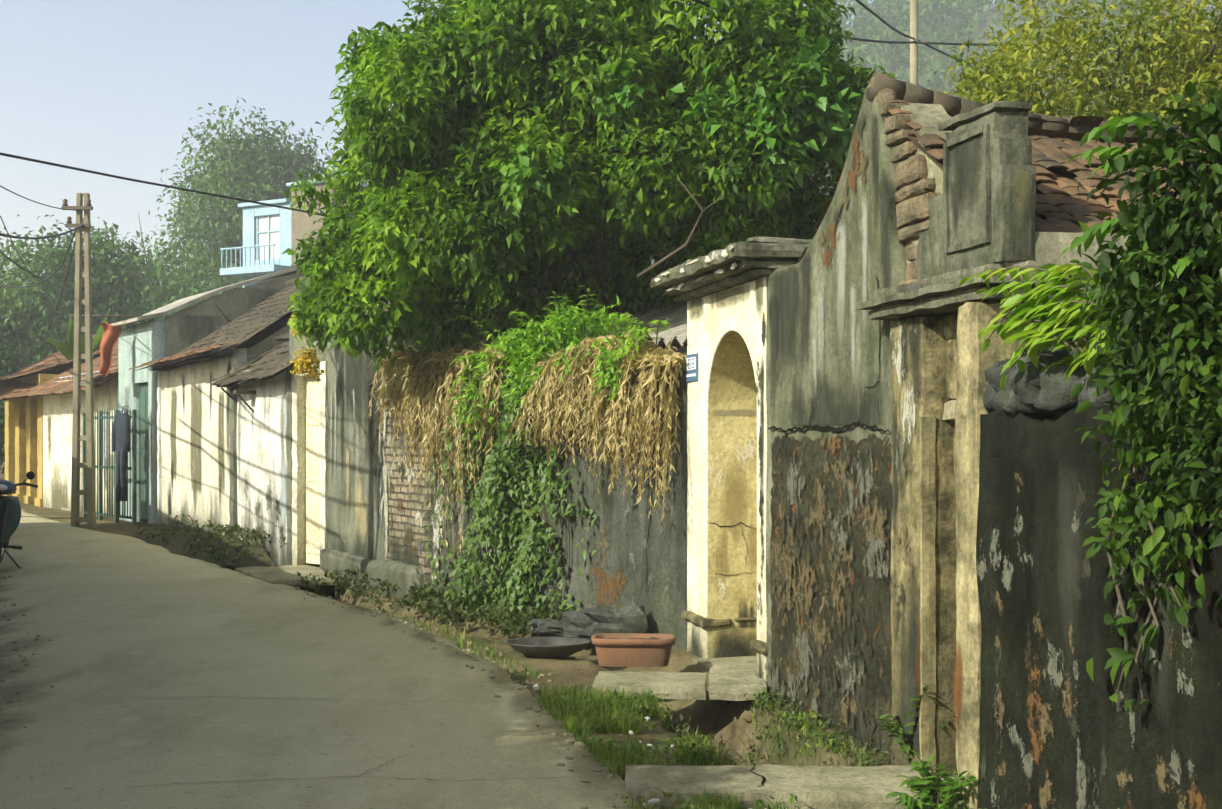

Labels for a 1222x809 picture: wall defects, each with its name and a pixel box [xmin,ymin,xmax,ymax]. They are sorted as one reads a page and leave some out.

damp [838,117,890,358]
damp [168,363,265,531]
damp [245,395,287,566]
damp [691,255,897,532]
spalling [733,313,918,758]
crack [768,320,891,433]
damp [885,320,919,406]
damp [900,573,920,757]
spalling [976,470,1033,618]
spalling [980,611,1136,809]
spalling [1148,558,1204,697]
spalling [1155,745,1207,809]